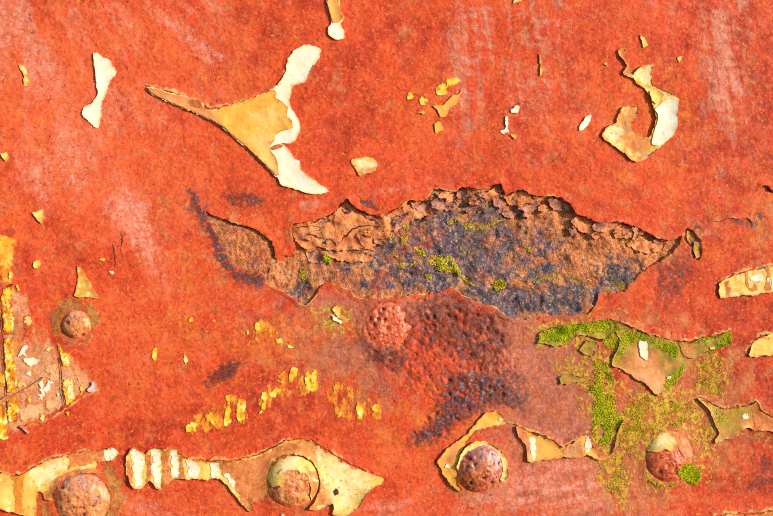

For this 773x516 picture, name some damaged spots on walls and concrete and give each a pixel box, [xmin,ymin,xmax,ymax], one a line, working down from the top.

peeling [326,0,345,40]
peeling [82,53,117,128]
peeling [141,38,329,194]
peeling [602,48,679,162]
crack [707,212,759,228]
crack [752,180,773,194]
rust [189,175,701,446]
peeling [714,258,773,298]
peeling [0,272,101,440]
peeling [0,430,385,516]
peeling [437,411,625,492]
peeling [695,391,773,444]